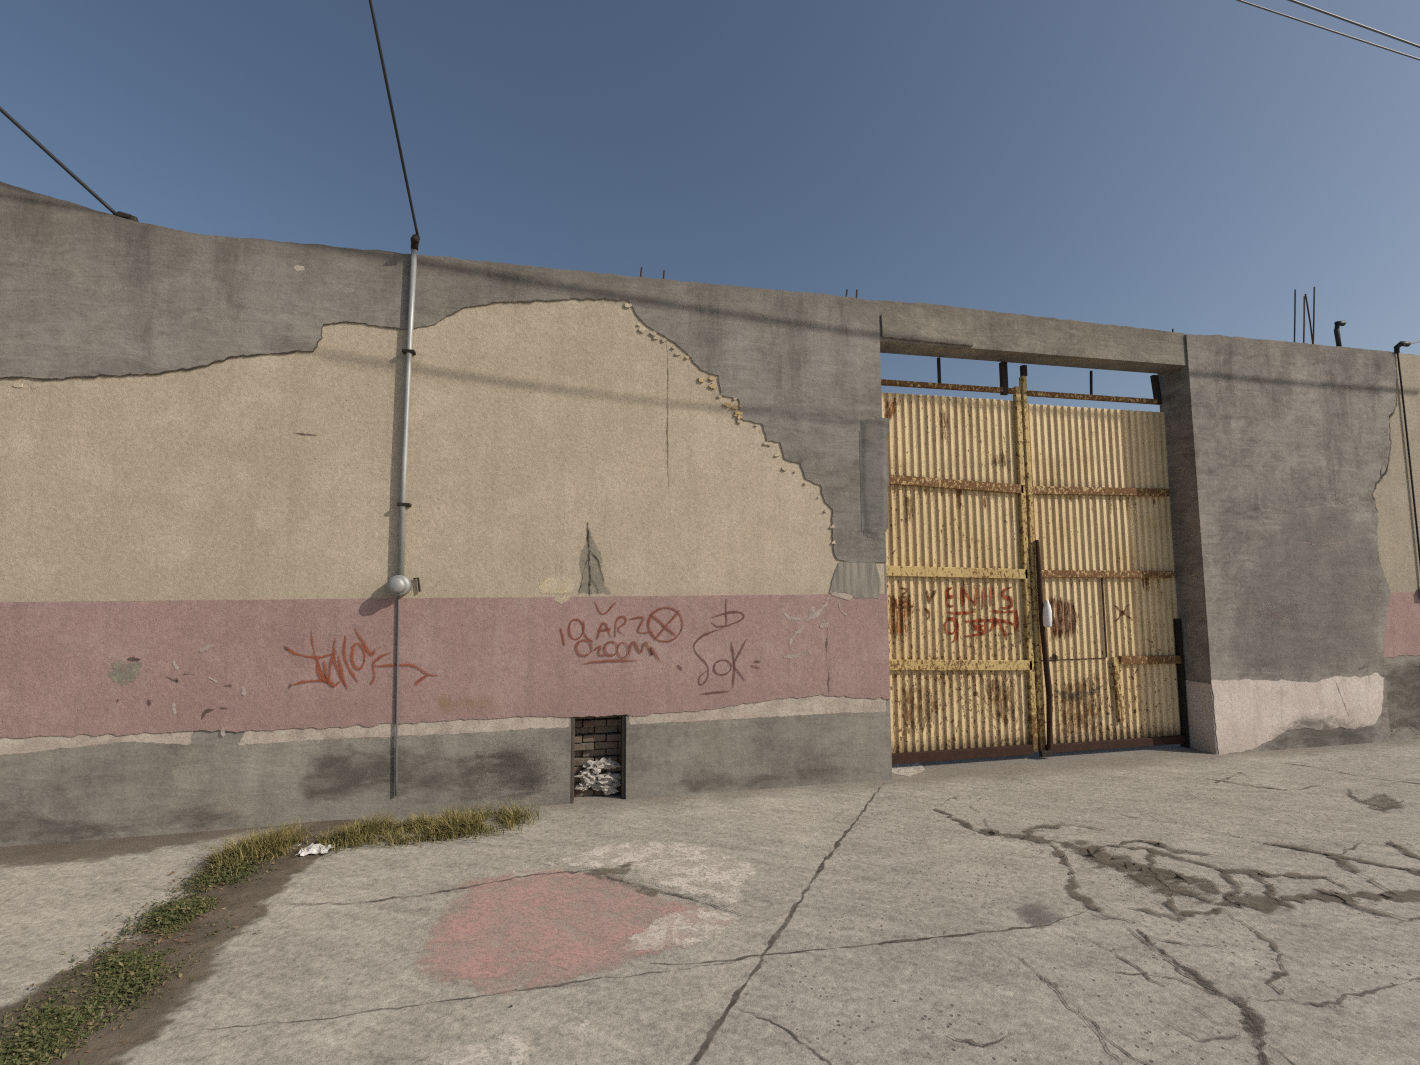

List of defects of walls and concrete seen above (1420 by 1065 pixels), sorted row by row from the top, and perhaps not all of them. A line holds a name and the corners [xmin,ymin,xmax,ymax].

corrosion [893,489,962,523]
spalling [538,532,611,604]
peeling [830,561,881,600]
corrosion [887,581,914,638]
corrosion [1049,578,1088,640]
corrosion [893,673,945,737]
corrosion [971,674,1019,727]
corrosion [1055,673,1175,737]
water stain [309,755,440,797]
crack [290,869,777,920]
crack [934,772,1420,1065]
crack [738,1007,832,1065]